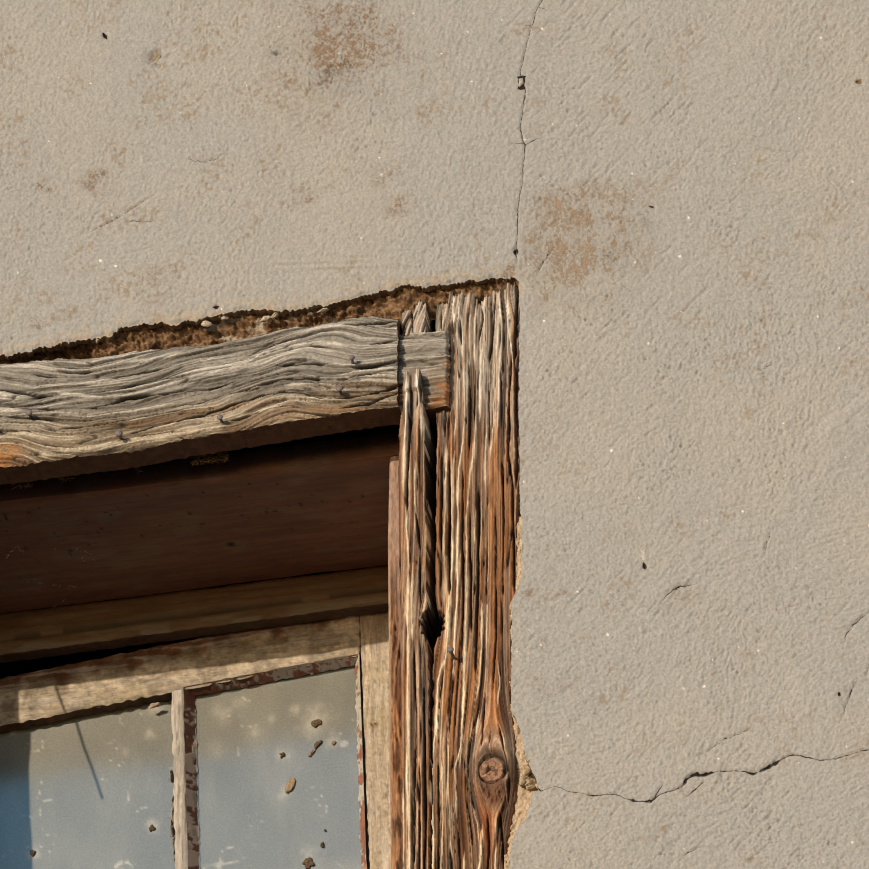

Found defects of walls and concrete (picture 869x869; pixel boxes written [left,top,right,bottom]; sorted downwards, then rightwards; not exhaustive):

crack [516,0,544,258]
flaking render [0,276,519,364]
flaking render [504,704,539,869]
crack [537,731,866,803]